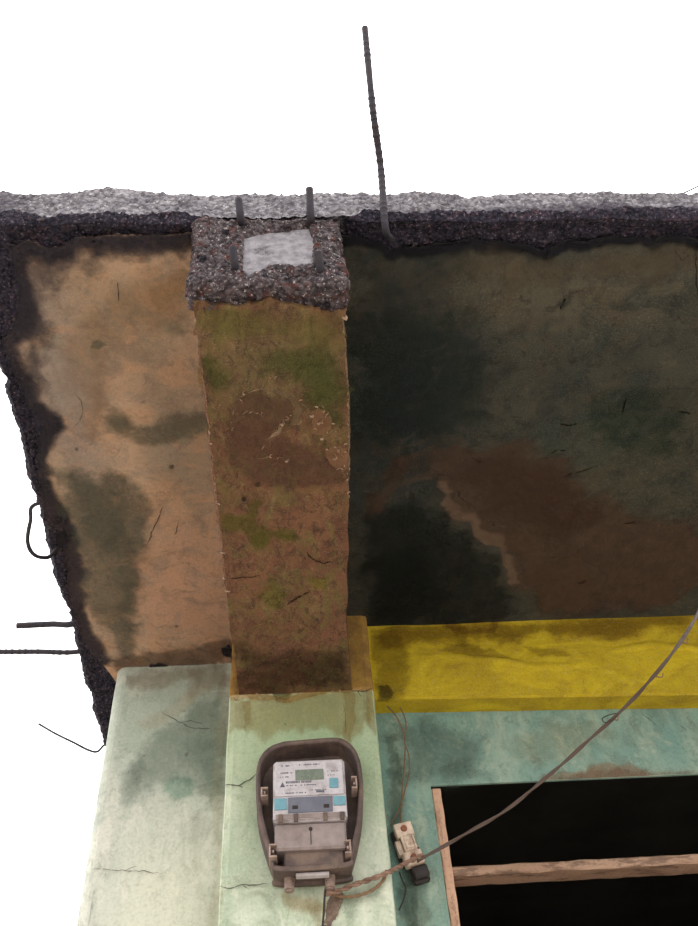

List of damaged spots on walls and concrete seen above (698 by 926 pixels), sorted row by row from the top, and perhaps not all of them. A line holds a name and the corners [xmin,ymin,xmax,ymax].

water stain [1,233,192,666]
spalling [0,25,698,753]
water stain [363,441,698,625]